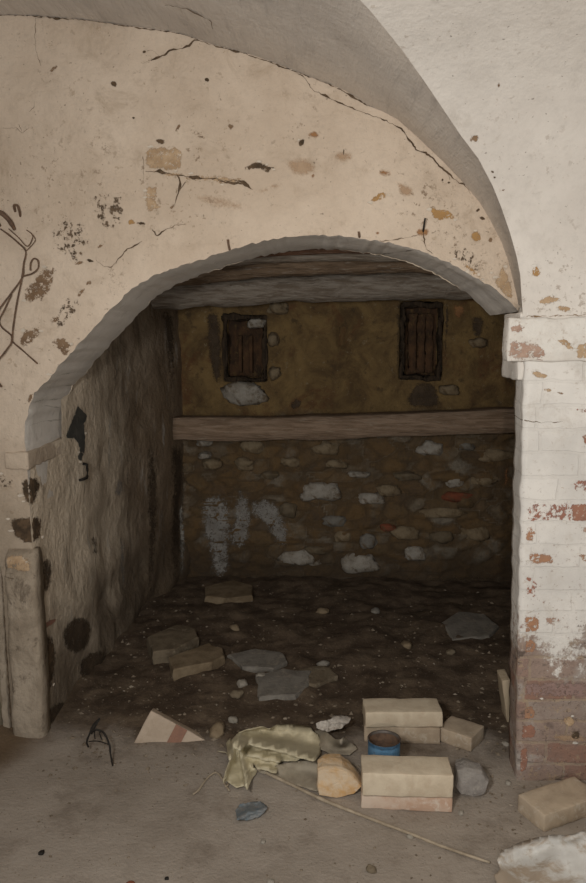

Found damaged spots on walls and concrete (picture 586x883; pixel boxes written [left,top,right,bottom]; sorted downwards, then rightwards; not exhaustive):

crack [0,5,469,190]
flaking render [94,194,145,227]
crack [98,159,251,268]
flaking render [52,221,93,265]
peeling [505,324,563,394]
peeling [558,339,586,358]
spalling [66,407,87,463]
spalling [6,517,44,543]
peeling [526,501,586,541]
peeling [526,553,553,563]
leakage [62,618,106,677]
spalling [525,617,560,653]